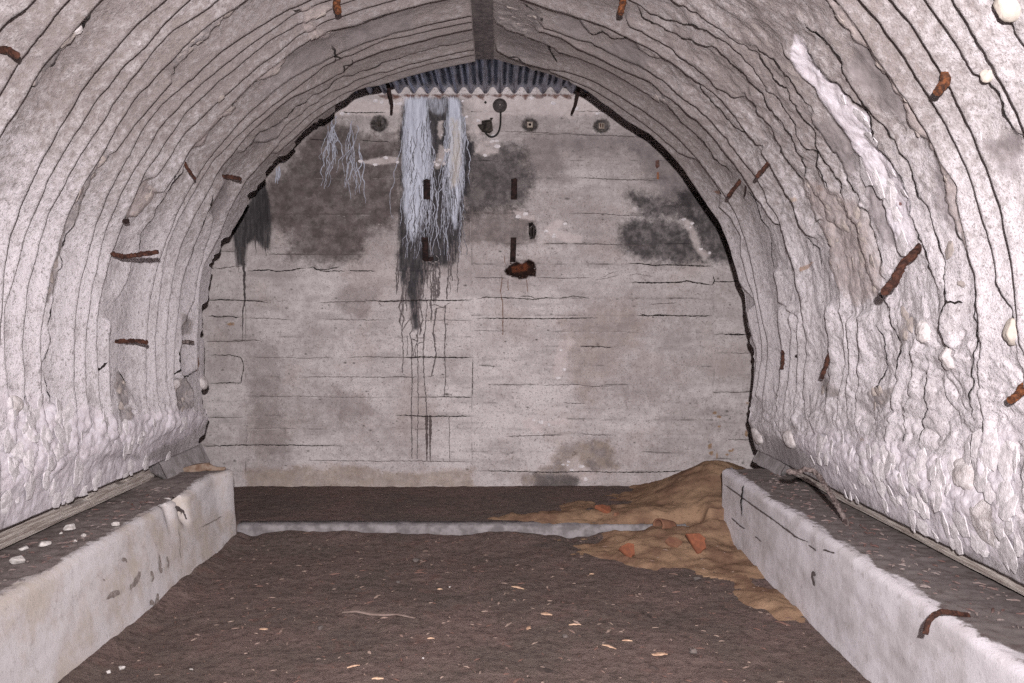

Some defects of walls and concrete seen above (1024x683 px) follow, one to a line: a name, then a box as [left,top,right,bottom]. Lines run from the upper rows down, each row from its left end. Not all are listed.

crack [217,254,373,272]
leakage [232,96,533,461]
crack [569,210,649,218]
crack [576,175,656,183]
leakage [621,191,733,264]
crack [174,299,517,417]